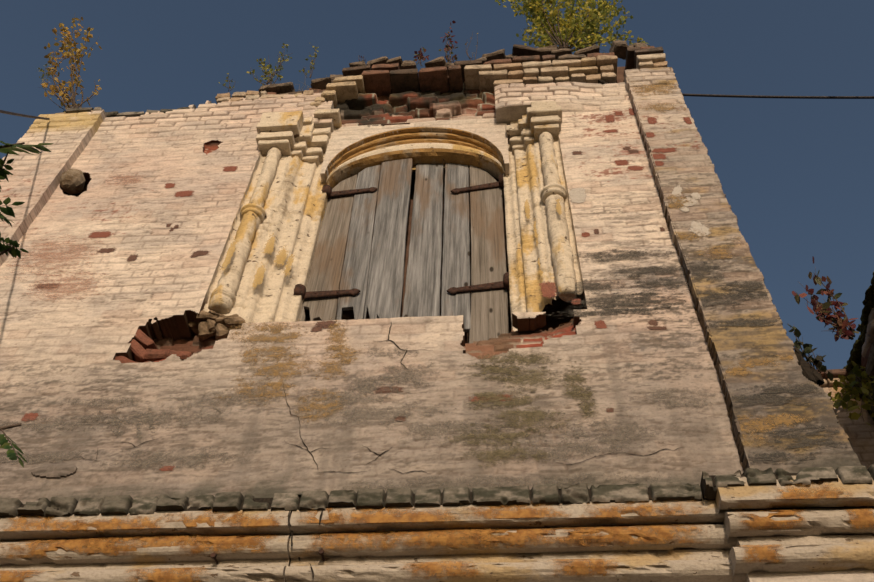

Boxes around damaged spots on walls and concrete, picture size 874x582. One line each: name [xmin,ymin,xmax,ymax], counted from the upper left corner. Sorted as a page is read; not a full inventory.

spalling [334,81,496,127]
leakage [633,81,686,113]
spalling [115,310,246,363]
crack [378,323,430,372]
spalling [464,319,581,359]
leakage [0,321,659,489]
crack [283,385,427,474]